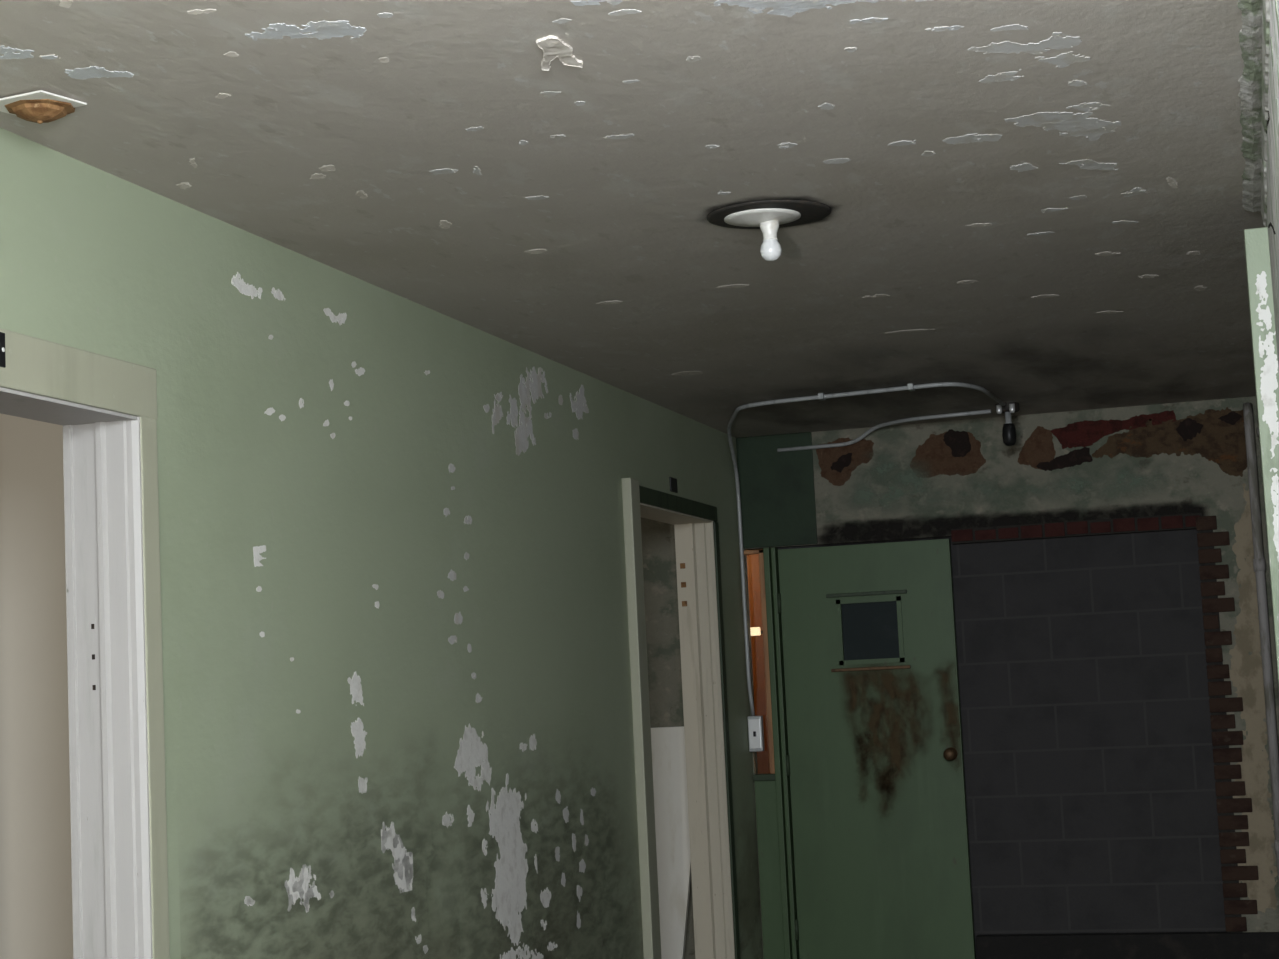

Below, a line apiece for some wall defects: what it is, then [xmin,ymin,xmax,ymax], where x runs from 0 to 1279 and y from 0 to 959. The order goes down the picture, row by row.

peeling [0,45,134,80]
peeling [536,0,642,71]
peeling [714,0,888,24]
peeling [483,367,589,456]
peeling [1255,271,1279,562]
spalling [816,438,874,486]
spalling [910,429,986,478]
peeling [347,672,367,758]
peeling [285,864,334,913]
peeling [381,822,413,893]
peeling [442,723,589,959]
peeling [411,907,428,954]